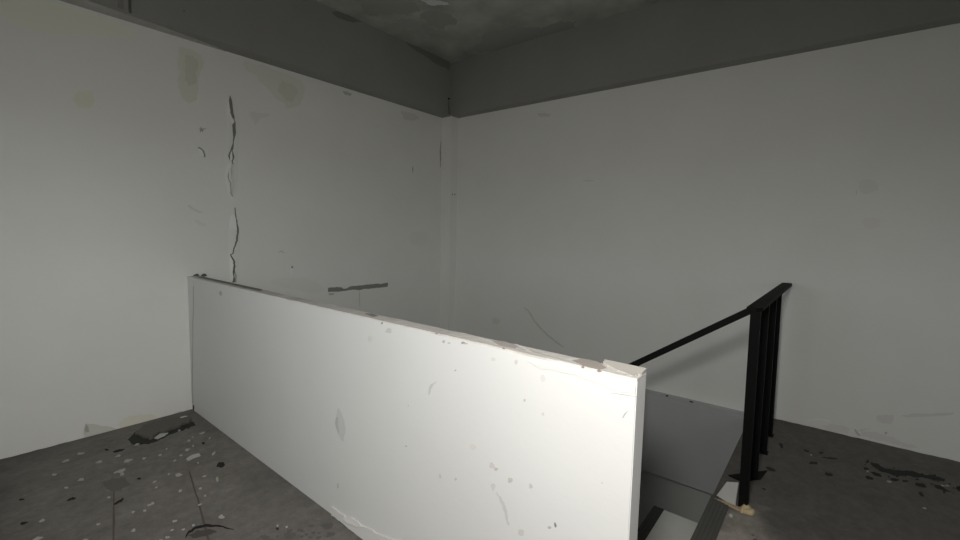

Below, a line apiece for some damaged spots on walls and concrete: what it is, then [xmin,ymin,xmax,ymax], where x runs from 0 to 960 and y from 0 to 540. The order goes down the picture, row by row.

crack [228,96,239,282]
spalling [328,283,388,292]
flaking render [330,506,396,540]